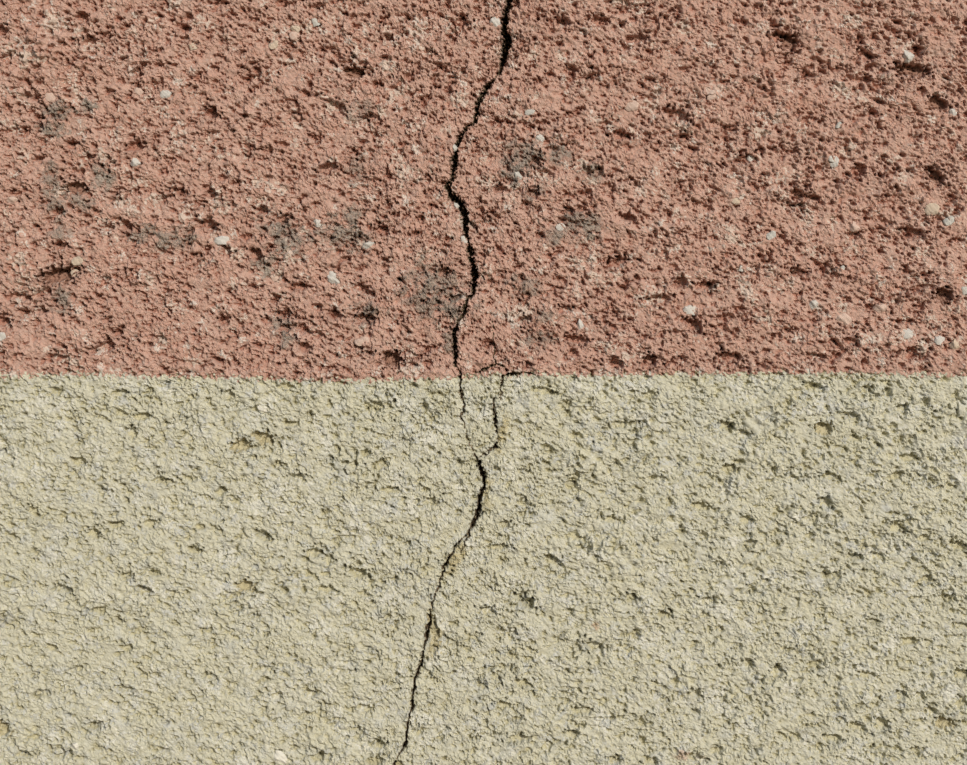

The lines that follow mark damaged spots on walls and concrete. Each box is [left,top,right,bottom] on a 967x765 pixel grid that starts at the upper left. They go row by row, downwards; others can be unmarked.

crack [392,0,538,765]